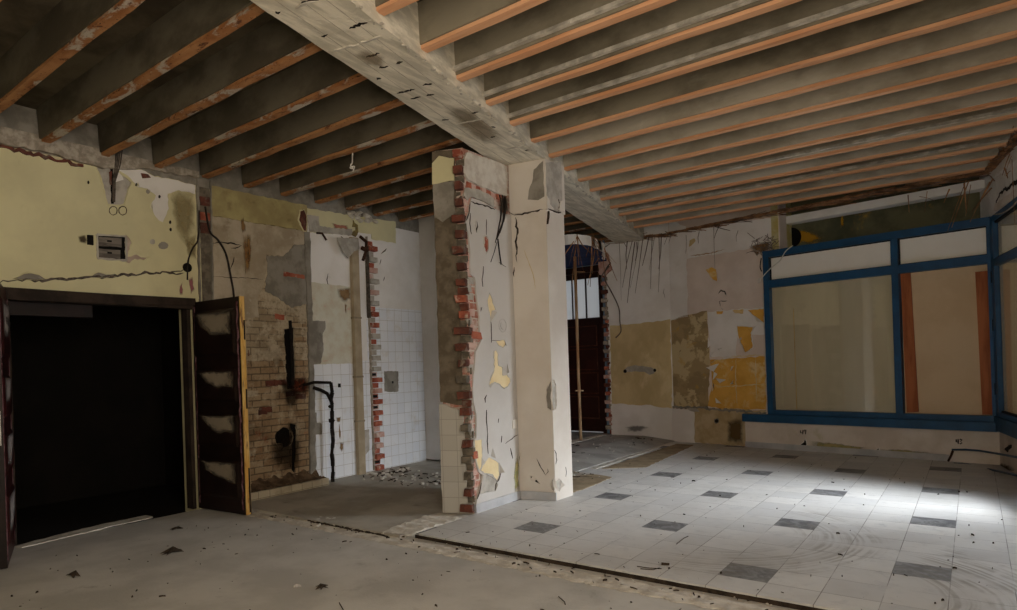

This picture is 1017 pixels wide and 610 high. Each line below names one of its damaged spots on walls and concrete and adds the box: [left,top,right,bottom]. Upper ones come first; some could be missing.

peeling [96,167,196,223]
crack [0,270,183,283]
peeling [283,272,353,364]
spalling [365,236,399,471]
peeling [488,339,511,389]
peeling [706,308,765,403]
peeling [315,412,323,436]
peeling [474,438,505,494]